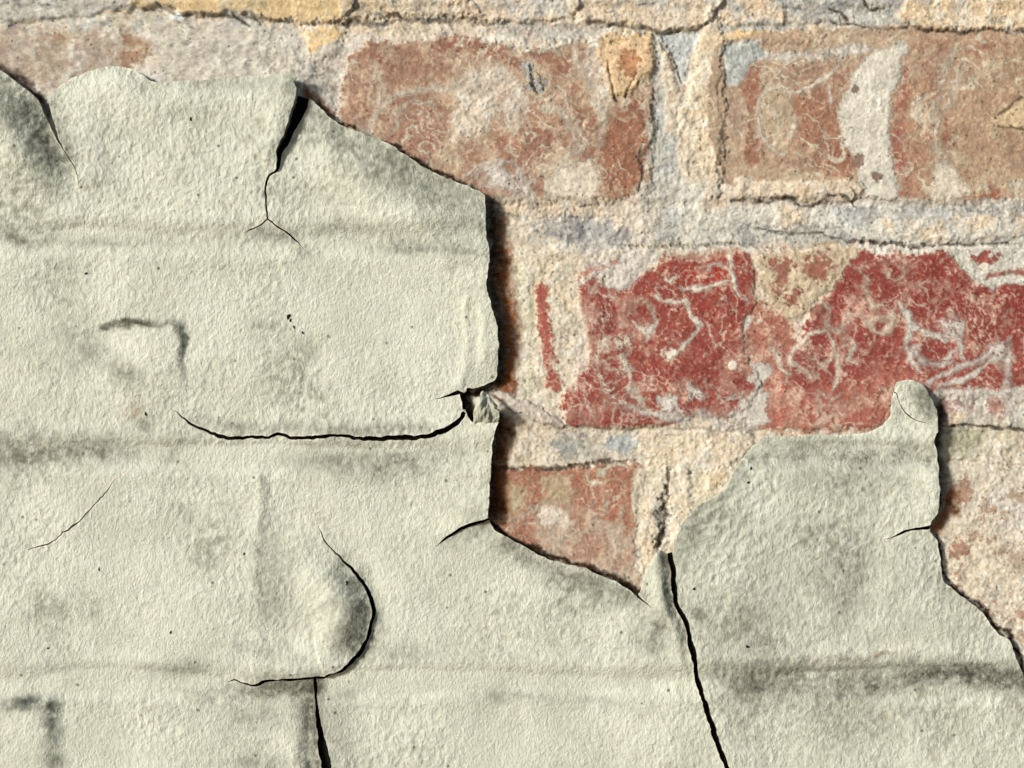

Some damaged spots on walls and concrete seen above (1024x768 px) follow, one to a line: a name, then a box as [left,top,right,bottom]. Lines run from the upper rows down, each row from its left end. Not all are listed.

crack [246,96,309,248]
spalling [518,56,548,94]
spalling [597,33,656,96]
peeling [837,39,908,201]
spalling [990,96,1024,134]
spalling [757,241,859,319]
crack [174,390,466,441]
peeling [0,66,724,768]
crack [25,475,121,551]
crack [228,523,376,768]
crack [636,472,729,768]
peeling [673,380,1024,768]